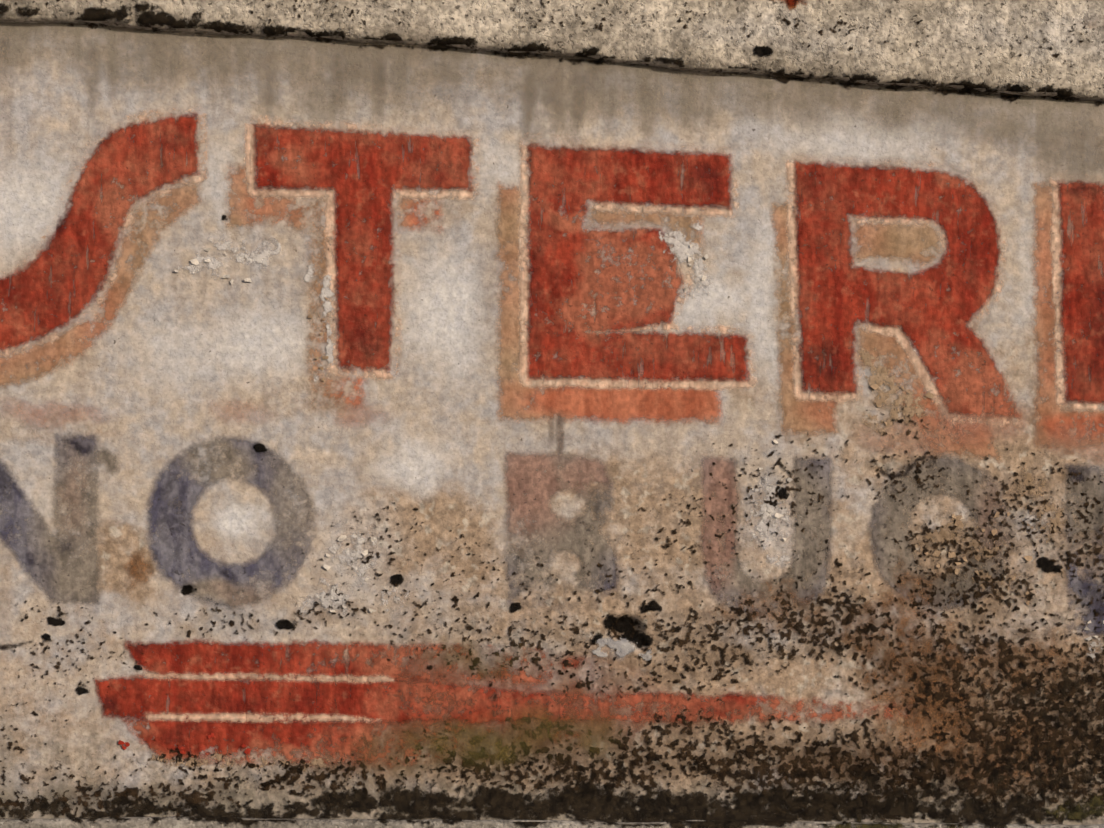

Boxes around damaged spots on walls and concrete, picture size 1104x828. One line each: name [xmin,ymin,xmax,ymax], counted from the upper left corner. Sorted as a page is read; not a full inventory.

peeling [174,237,281,284]
peeling [659,222,713,299]
hole [592,600,662,661]